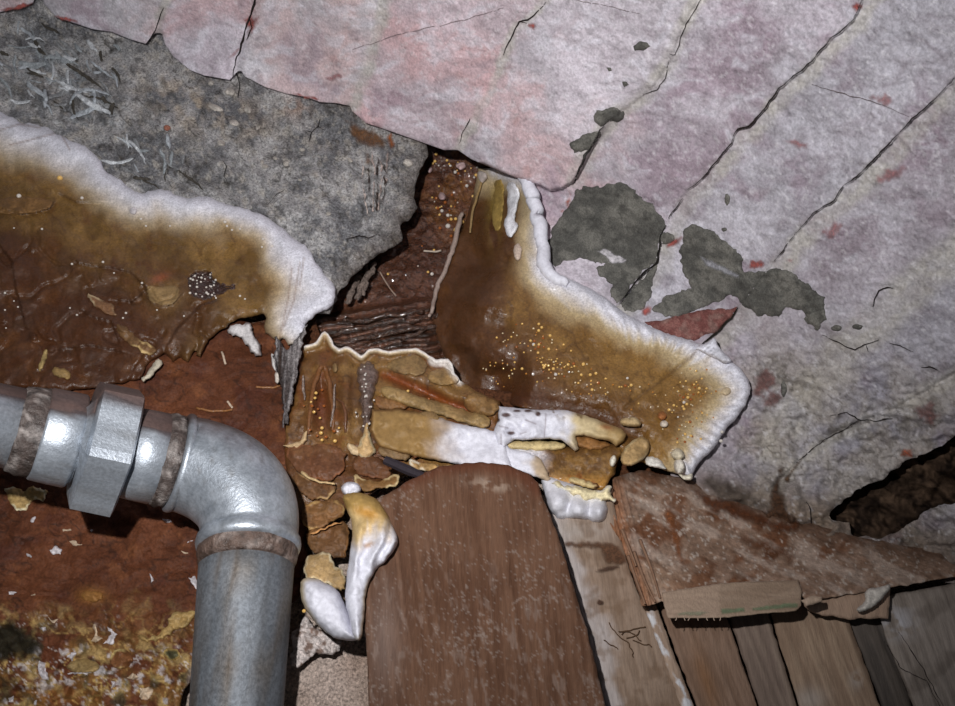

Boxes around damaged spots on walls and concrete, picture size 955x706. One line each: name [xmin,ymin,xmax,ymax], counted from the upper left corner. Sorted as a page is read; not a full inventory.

peeling [0,0,491,359]
crack [574,127,603,183]
crack [619,0,954,303]
leakage [187,272,236,300]
spalling [643,307,737,341]
leakage [356,361,379,433]
spalling [829,436,955,539]
leakage [565,542,625,571]